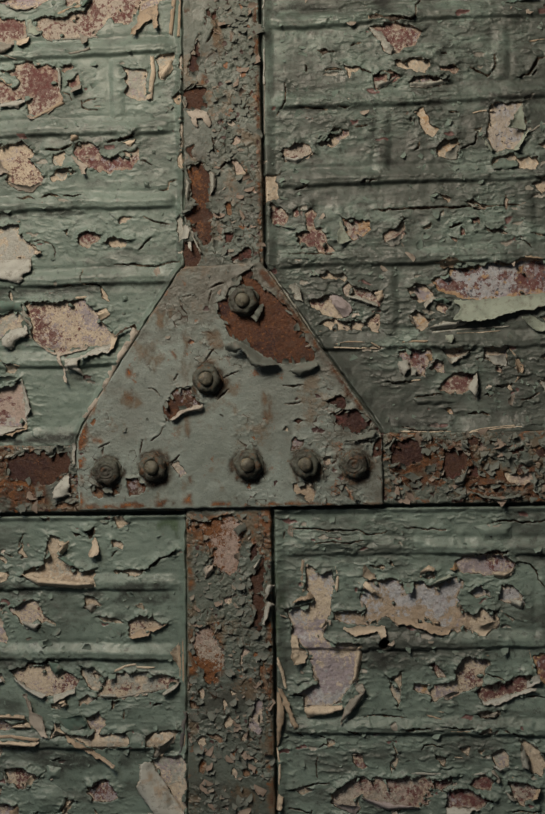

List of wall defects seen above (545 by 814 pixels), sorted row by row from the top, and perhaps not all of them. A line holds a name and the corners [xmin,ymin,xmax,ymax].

peeling [0,0,162,119]
rust [182,33,212,128]
peeling [473,102,545,170]
rust [180,145,216,266]
peeling [0,221,136,383]
rust [214,240,319,376]
rust [0,426,146,511]
rust [328,364,545,501]
peeling [374,255,545,507]
peeling [21,516,174,639]
rust [185,502,275,652]
peeling [0,536,545,814]